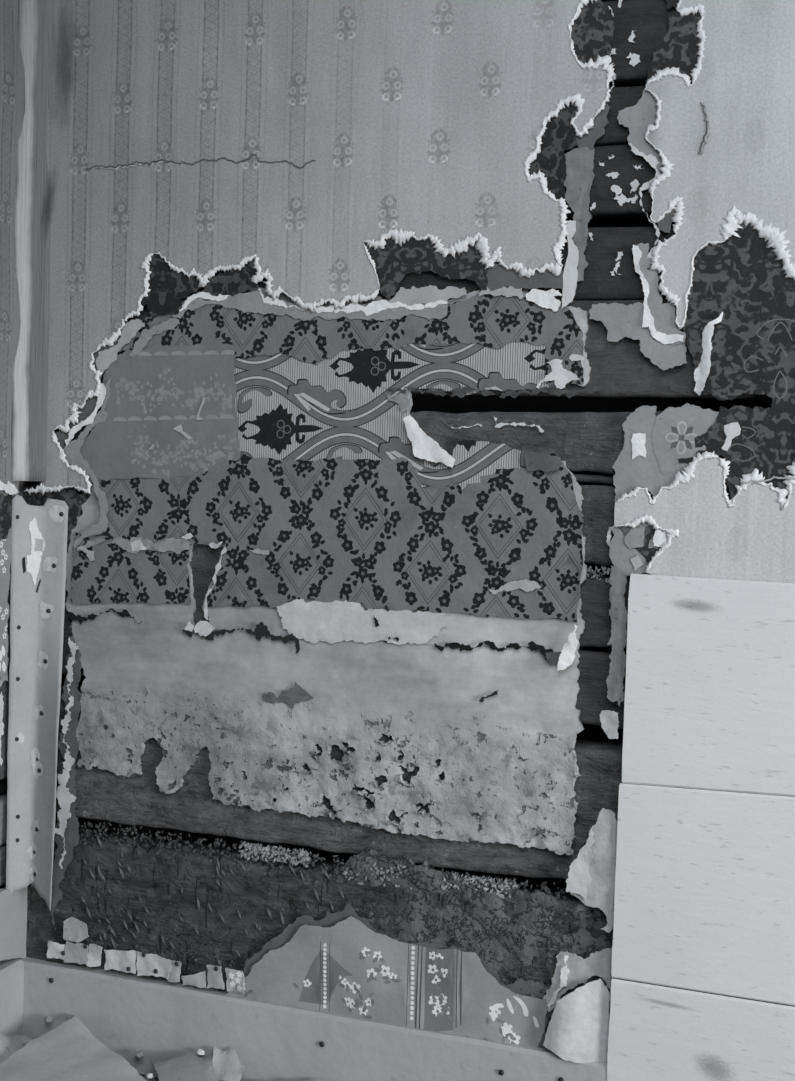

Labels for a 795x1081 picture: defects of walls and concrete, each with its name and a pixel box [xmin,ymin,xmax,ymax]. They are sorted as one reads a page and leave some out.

crack [86,154,316,171]
peeling [0,0,795,707]
peeling [262,680,314,718]
hole [303,742,355,775]
hole [374,734,393,762]
peeling [50,622,82,929]
hole [350,751,420,812]
hole [322,795,337,820]
hole [385,803,430,831]